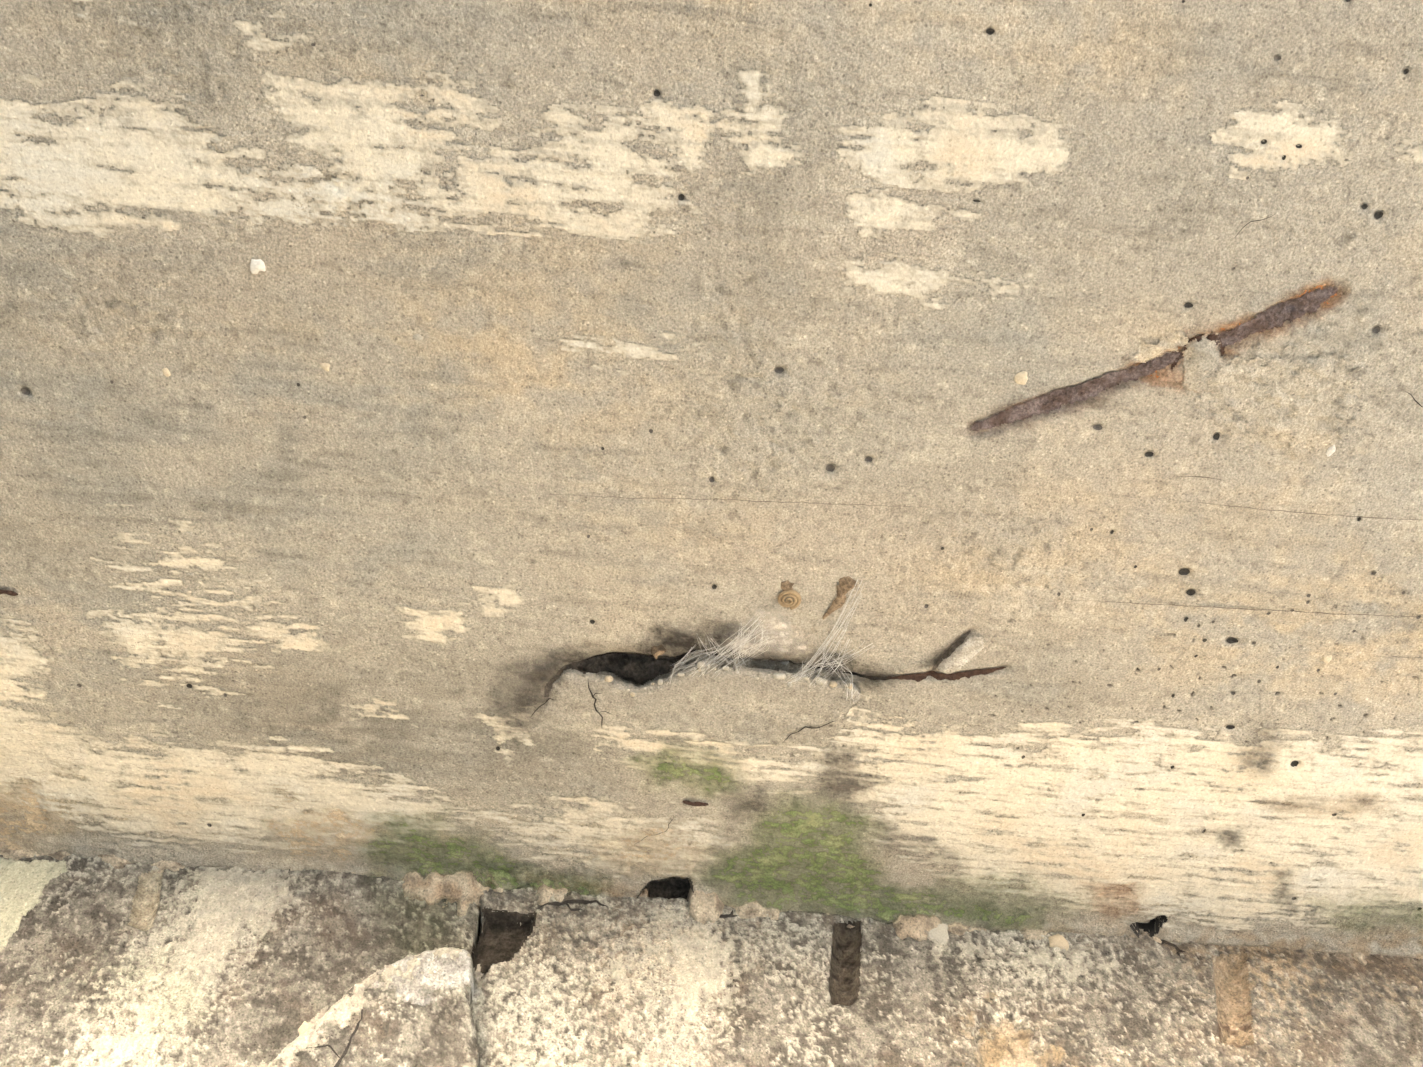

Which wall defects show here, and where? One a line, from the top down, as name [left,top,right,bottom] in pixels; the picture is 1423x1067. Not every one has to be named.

peeling [110,78,147,92]
peeling [678,194,703,215]
crack [532,630,1006,748]
peeling [1255,728,1313,738]
crack [306,1009,363,1067]